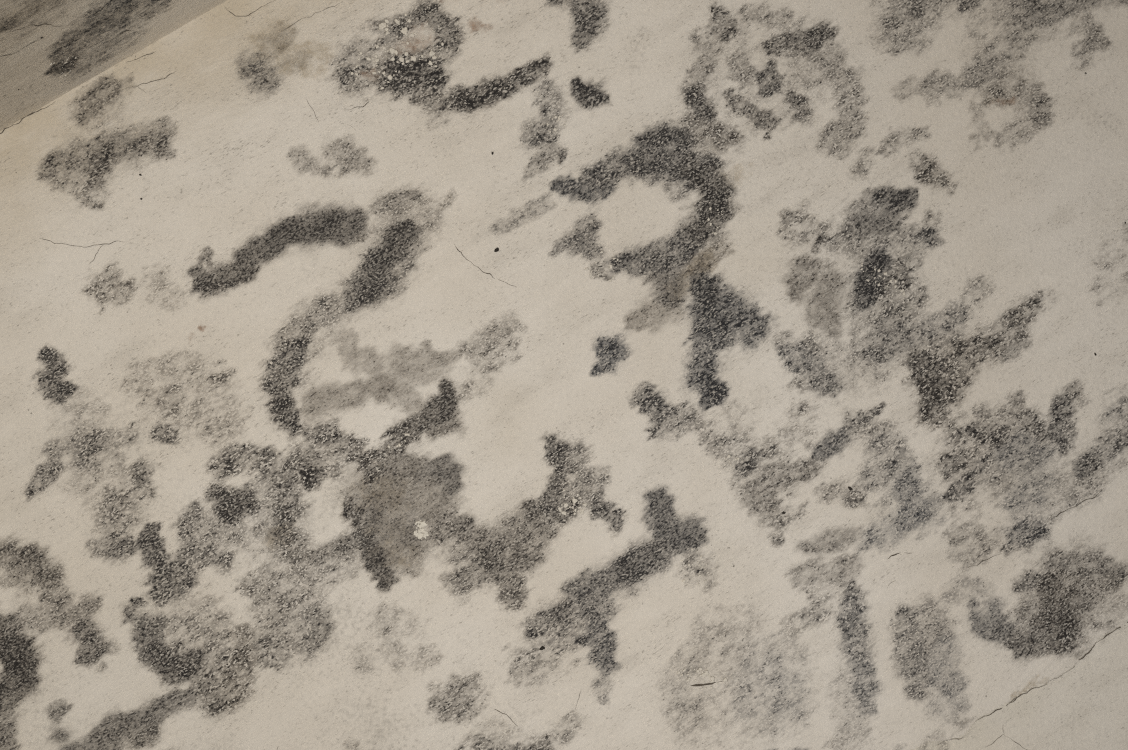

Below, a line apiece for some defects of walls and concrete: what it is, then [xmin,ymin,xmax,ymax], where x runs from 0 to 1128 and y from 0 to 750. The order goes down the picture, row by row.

damp [35,0,175,209]
damp [238,35,287,93]
damp [289,139,370,176]
damp [25,190,716,750]
damp [331,0,1128,750]
damp [0,541,115,750]
crack [938,622,1128,750]